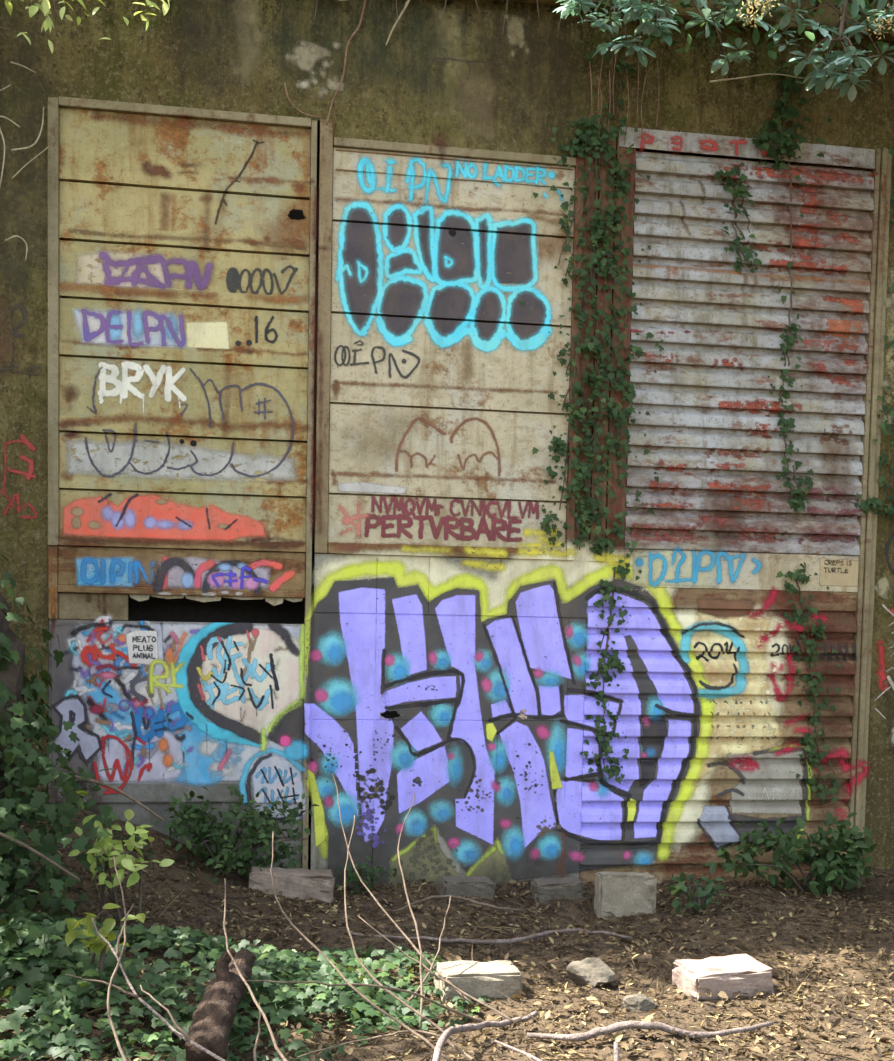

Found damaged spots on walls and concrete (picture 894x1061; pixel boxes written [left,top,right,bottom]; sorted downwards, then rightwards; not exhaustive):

spalling [286,41,344,97]
rust [143,162,191,177]
spalling [635,150,714,167]
rust [514,210,567,223]
peeling [708,162,878,275]
spalling [307,143,319,513]
rust [59,180,501,548]
rust [332,471,556,484]
peeling [624,398,802,554]
spalling [112,527,329,624]
rust [331,542,524,553]
peeling [798,530,870,556]